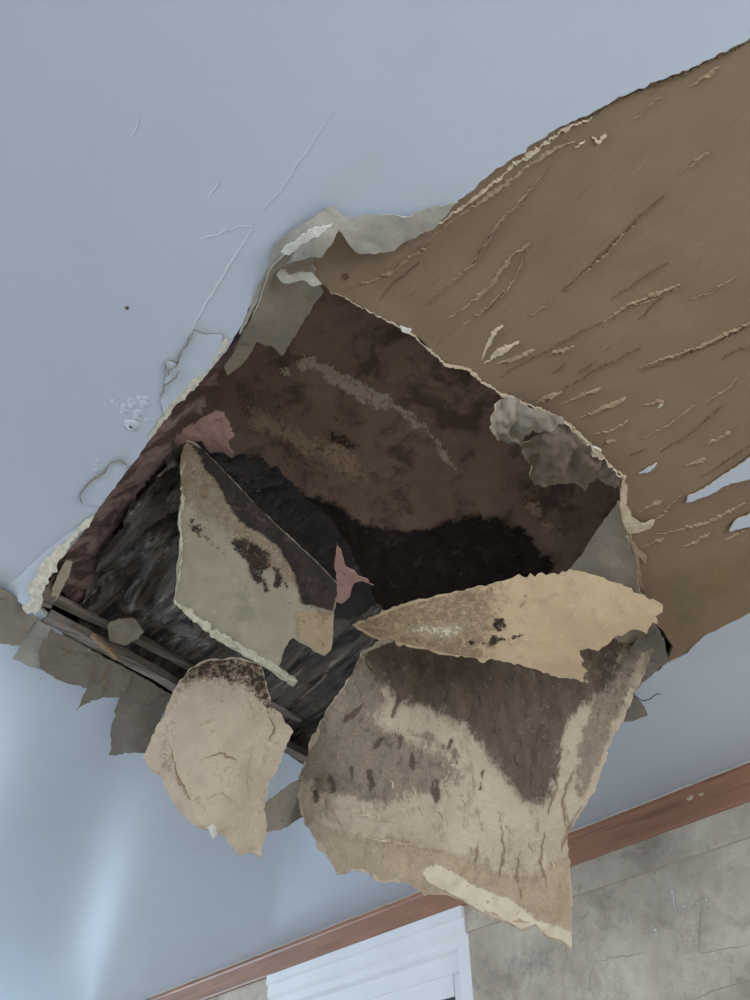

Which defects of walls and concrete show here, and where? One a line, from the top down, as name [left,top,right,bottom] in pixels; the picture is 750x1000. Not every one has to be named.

crack [186,114,331,339]
peeling [149,201,458,438]
damp [278,353,457,471]
peeling [4,460,126,616]
damp [181,441,336,654]
damp [182,659,275,713]
damp [294,486,642,809]
peeling [570,761,750,833]
damp [304,816,572,947]